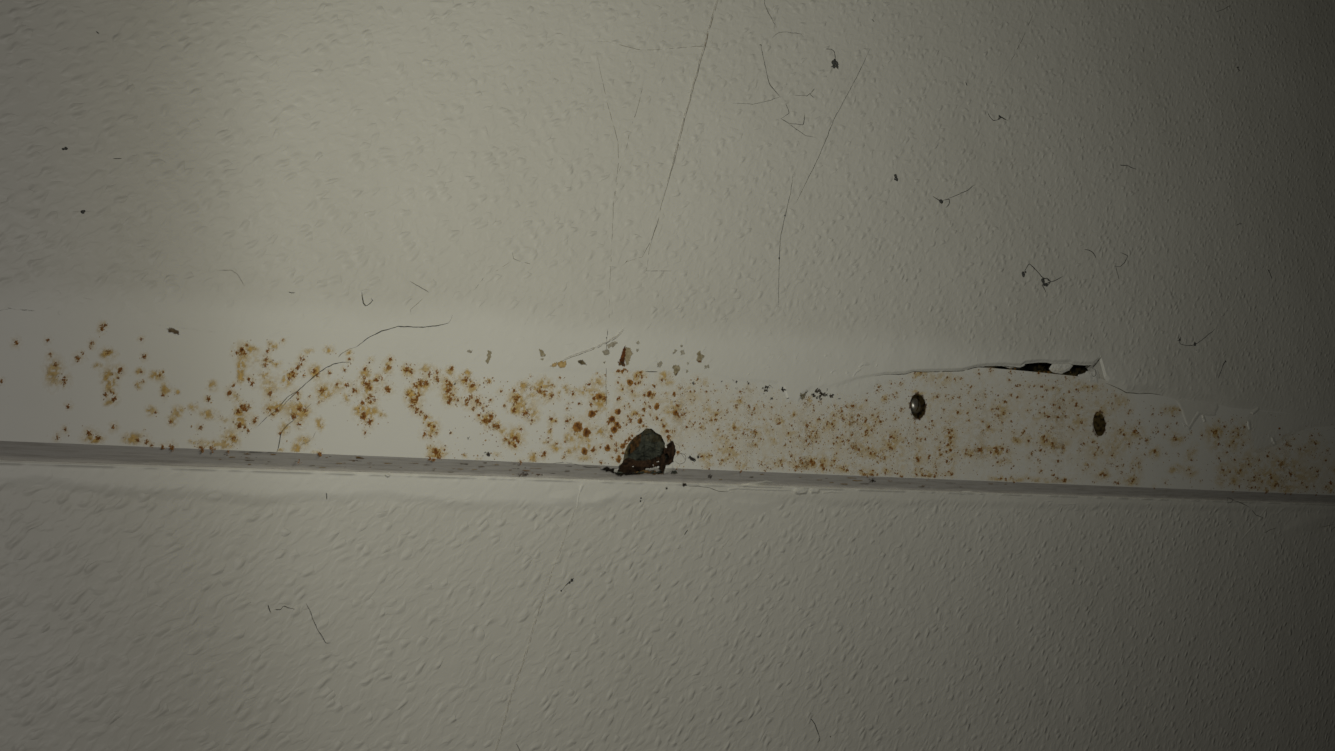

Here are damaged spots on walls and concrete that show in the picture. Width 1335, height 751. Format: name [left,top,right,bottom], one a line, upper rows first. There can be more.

flaking render [1049,363,1099,383]
corrosion [75,324,1335,495]
corrosion [55,424,174,452]